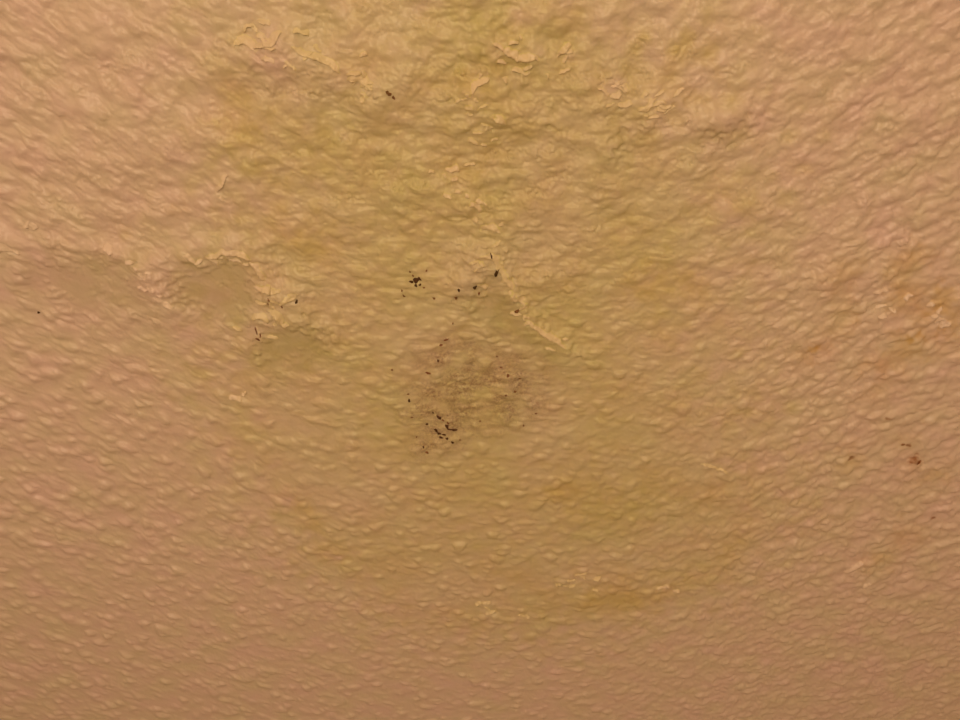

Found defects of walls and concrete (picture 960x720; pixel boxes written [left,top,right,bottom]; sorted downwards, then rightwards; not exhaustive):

peeling [234,19,373,104]
peeling [493,34,540,85]
peeling [454,73,506,147]
peeling [428,162,569,352]
water stain [425,412,461,444]